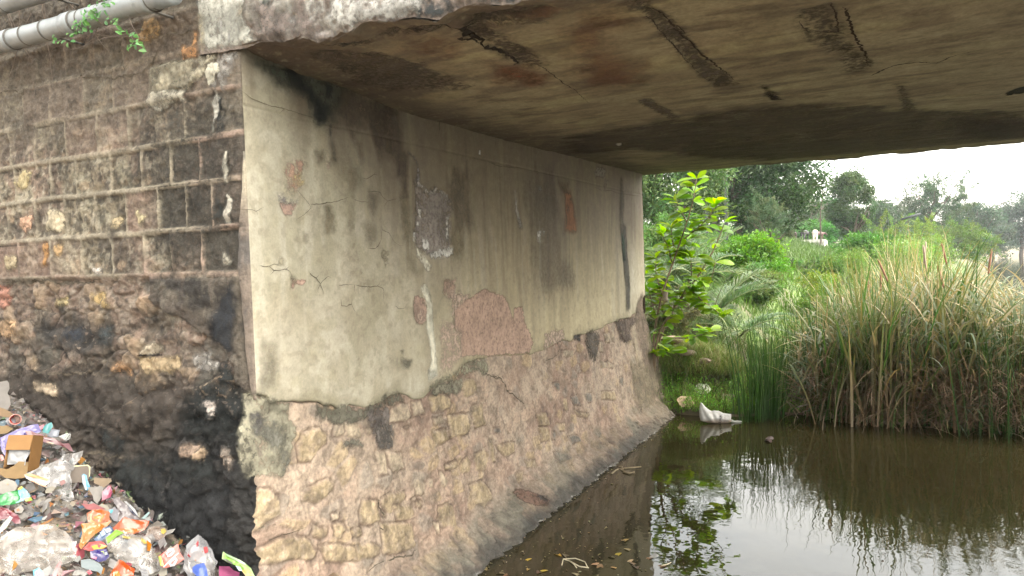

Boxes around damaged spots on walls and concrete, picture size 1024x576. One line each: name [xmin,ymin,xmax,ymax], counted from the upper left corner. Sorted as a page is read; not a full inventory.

crack [430,21,588,102]
crack [646,4,733,80]
crack [799,4,986,76]
water stain [257,61,469,271]
crack [262,265,404,311]
peeling [413,296,427,325]
water stain [422,285,437,379]
peeling [430,279,564,396]
water stain [574,330,599,362]
water stain [616,179,667,410]